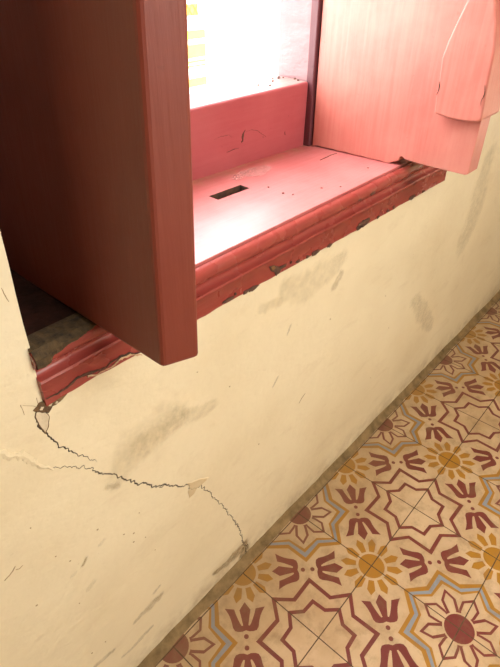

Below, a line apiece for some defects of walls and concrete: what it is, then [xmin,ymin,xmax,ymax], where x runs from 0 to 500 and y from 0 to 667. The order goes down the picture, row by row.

peeling [269,249,320,276]
crack [20,352,248,554]